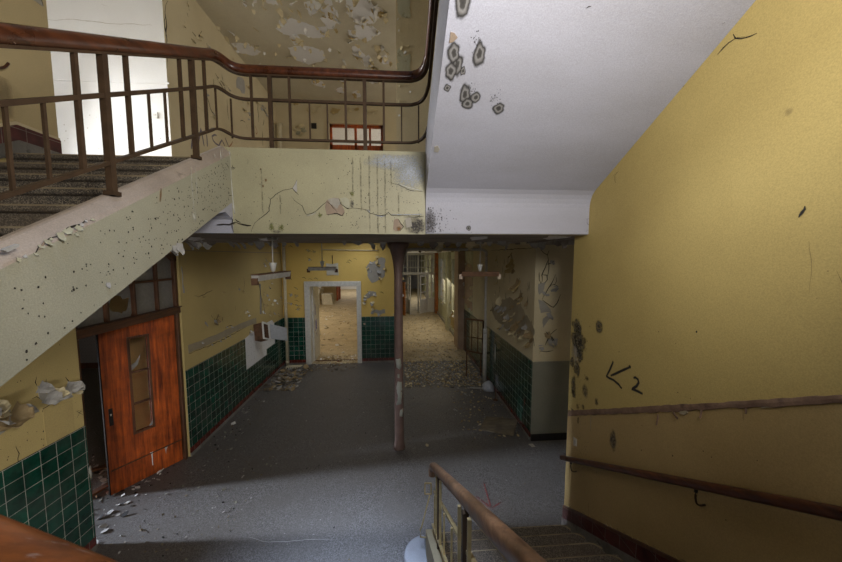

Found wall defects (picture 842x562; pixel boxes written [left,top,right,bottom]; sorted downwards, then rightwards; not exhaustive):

water stain [456,0,471,18]
peeling [216,0,411,71]
water stain [444,30,486,109]
water stain [491,89,504,114]
crack [217,180,326,232]
crack [350,208,420,217]
peeling [16,218,96,263]
peeling [172,237,316,261]
peeling [341,241,394,316]
peeling [409,236,570,357]
peeling [0,377,86,435]